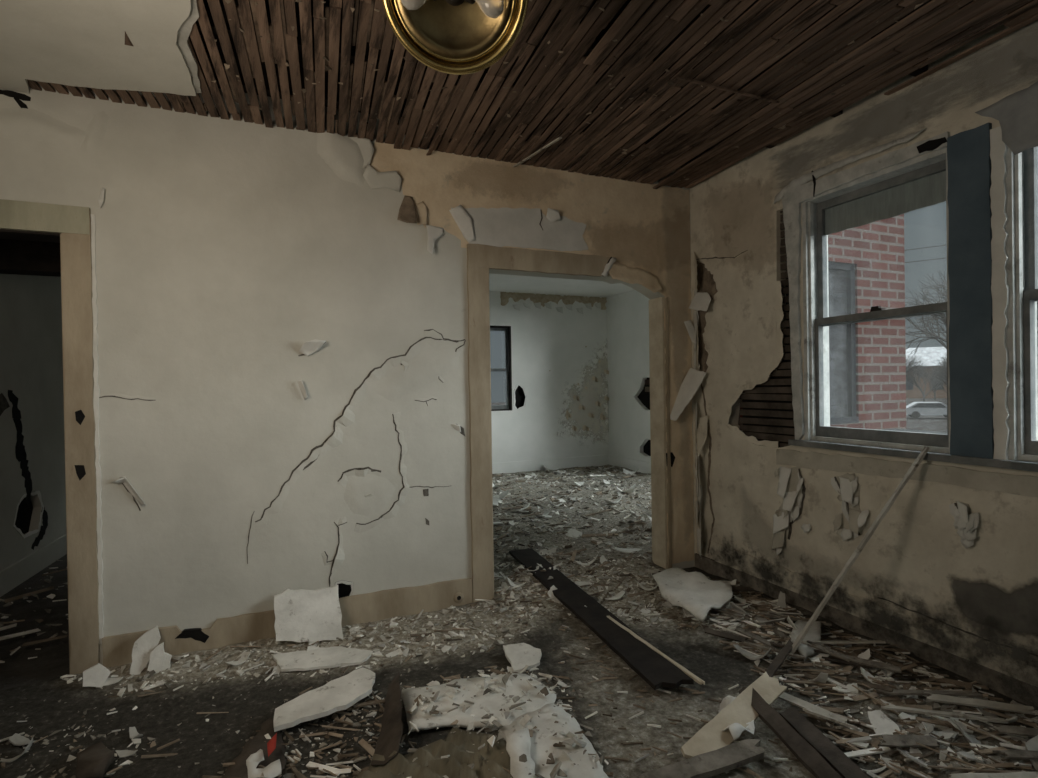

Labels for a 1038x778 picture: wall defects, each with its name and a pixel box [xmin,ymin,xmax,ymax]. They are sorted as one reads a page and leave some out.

crack [14,97,28,109]
spalling [27,0,1038,600]
crack [247,329,468,587]
spalling [13,491,44,539]
damp [711,543,1038,708]
peeling [815,580,942,650]
peeling [940,628,1038,685]